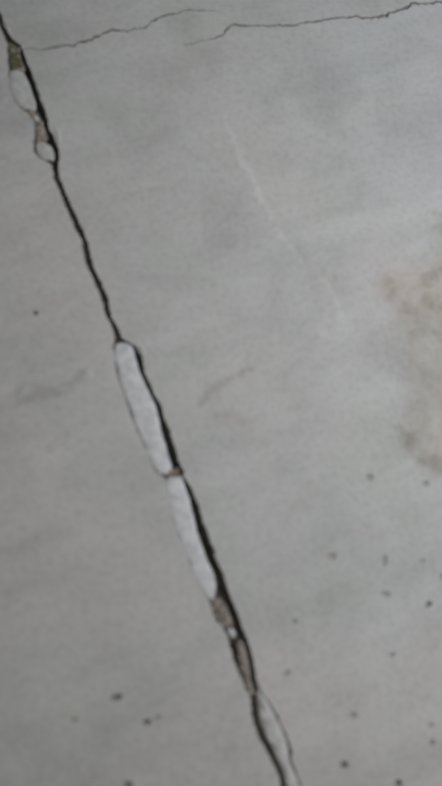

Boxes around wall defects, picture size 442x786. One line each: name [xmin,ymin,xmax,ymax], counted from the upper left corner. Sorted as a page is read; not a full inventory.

crack [0,9,302,786]
damp [362,199,442,485]